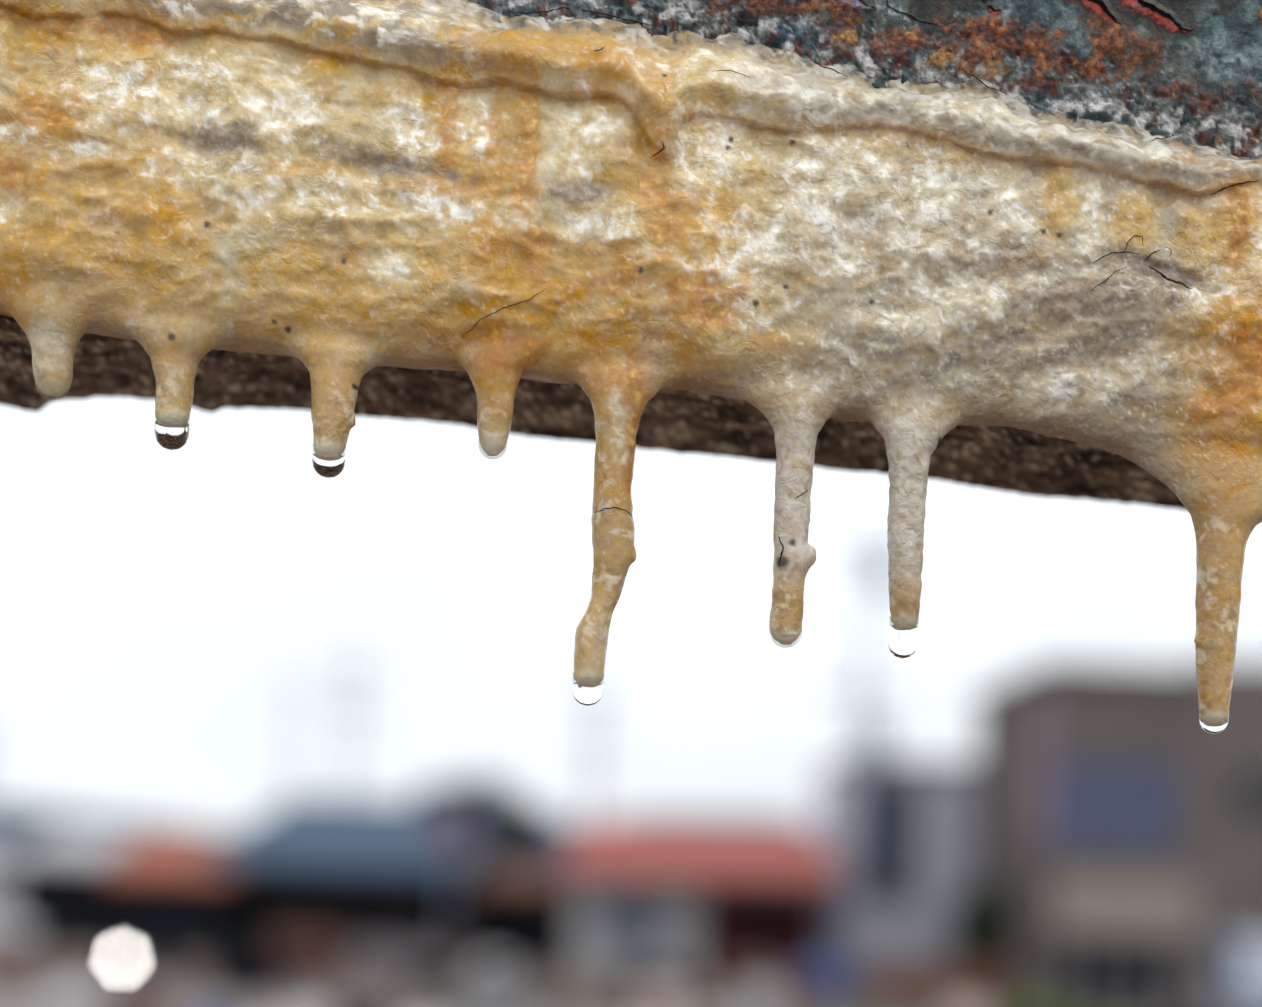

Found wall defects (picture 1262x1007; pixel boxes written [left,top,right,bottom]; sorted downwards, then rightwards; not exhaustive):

rust [731,0,1165,95]
peeling [1070,0,1192,33]
rust [484,85,540,207]
water stain [0,0,1262,721]